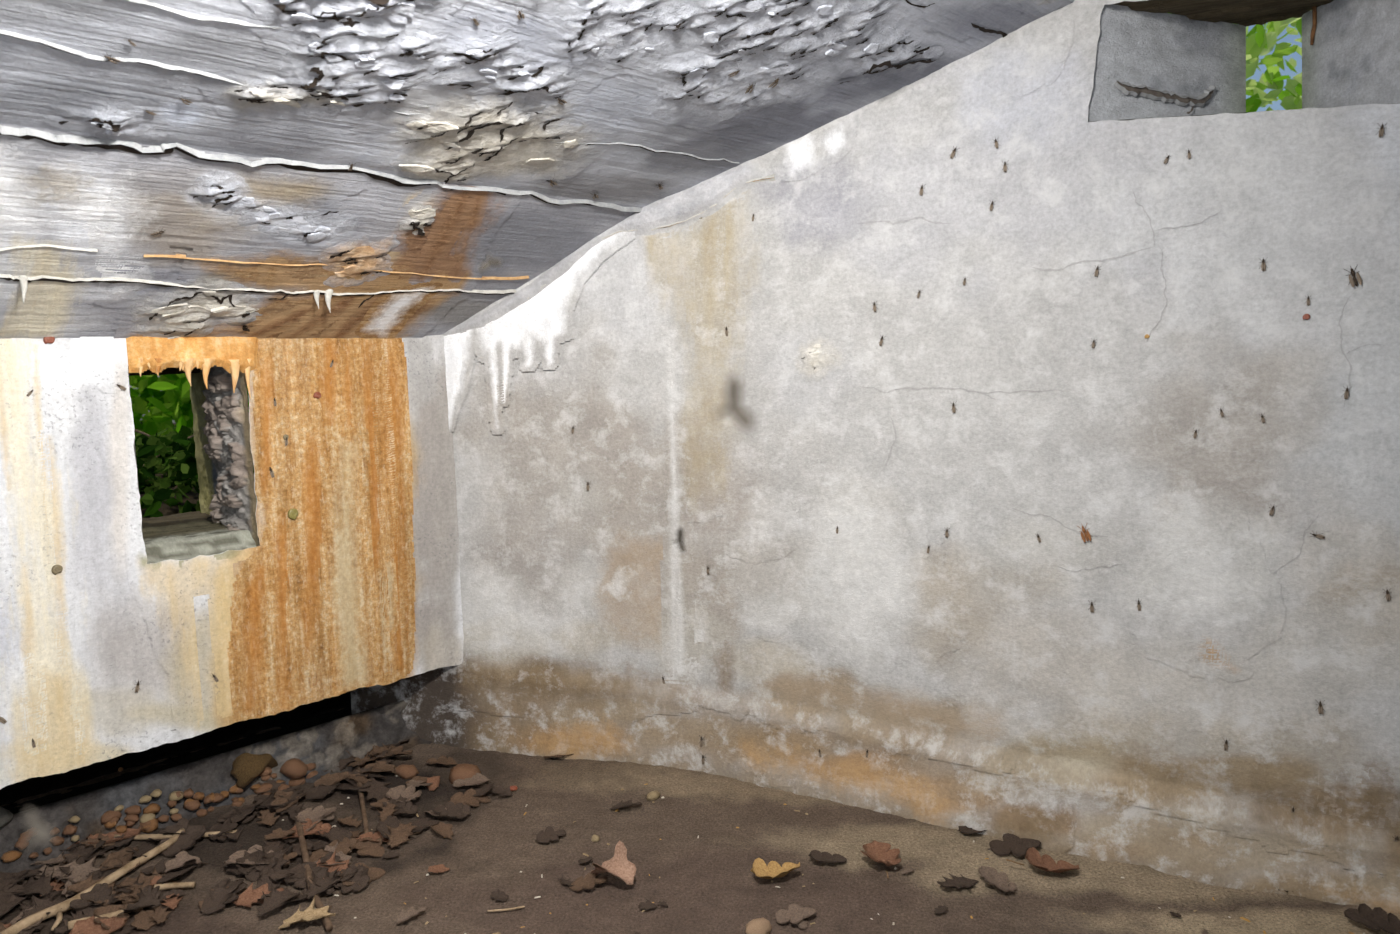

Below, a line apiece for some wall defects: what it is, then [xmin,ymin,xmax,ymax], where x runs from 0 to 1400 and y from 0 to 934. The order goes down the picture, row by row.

spalling [994,0,1074,17]
crack [0,29,243,85]
spalling [44,91,169,145]
crack [0,125,642,212]
spalling [176,0,976,288]
crack [541,138,739,164]
crack [0,274,516,308]
rust [114,182,522,740]
water stain [441,117,1075,853]
water stain [1090,720,1400,913]